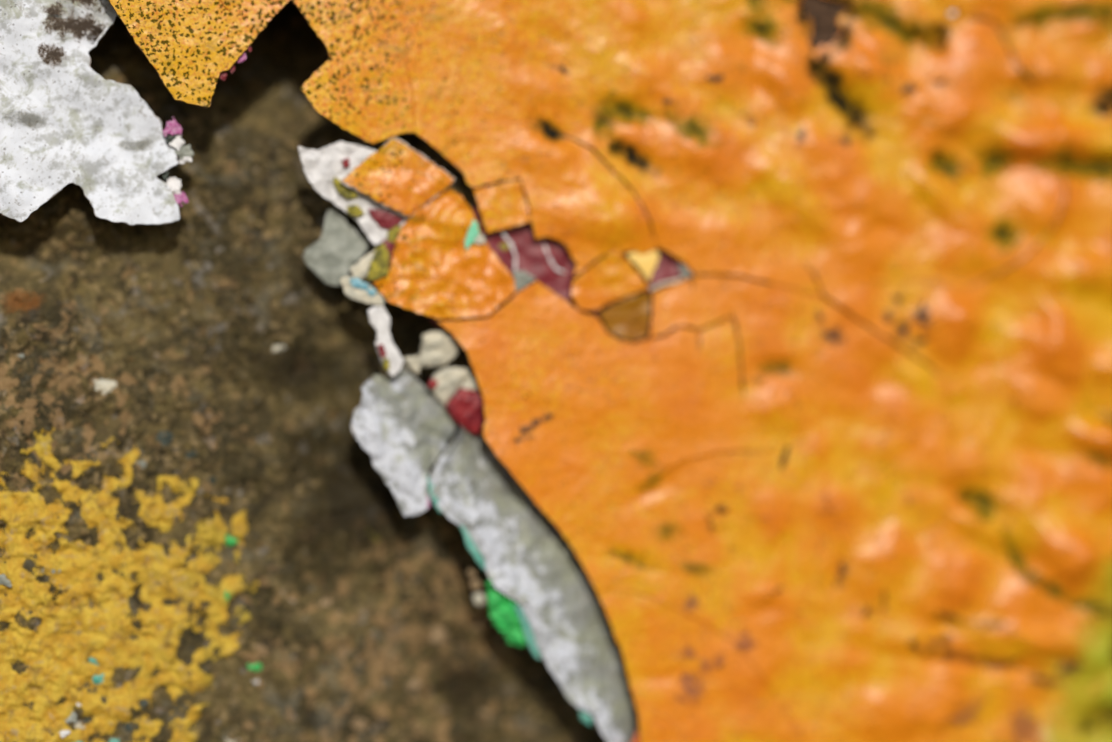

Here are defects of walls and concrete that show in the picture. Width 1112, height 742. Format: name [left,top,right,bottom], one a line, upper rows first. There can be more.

spalling [802,0,849,51]
crack [560,133,656,242]
spalling [0,0,693,742]
crack [648,309,744,399]
leakage [1002,530,1112,742]